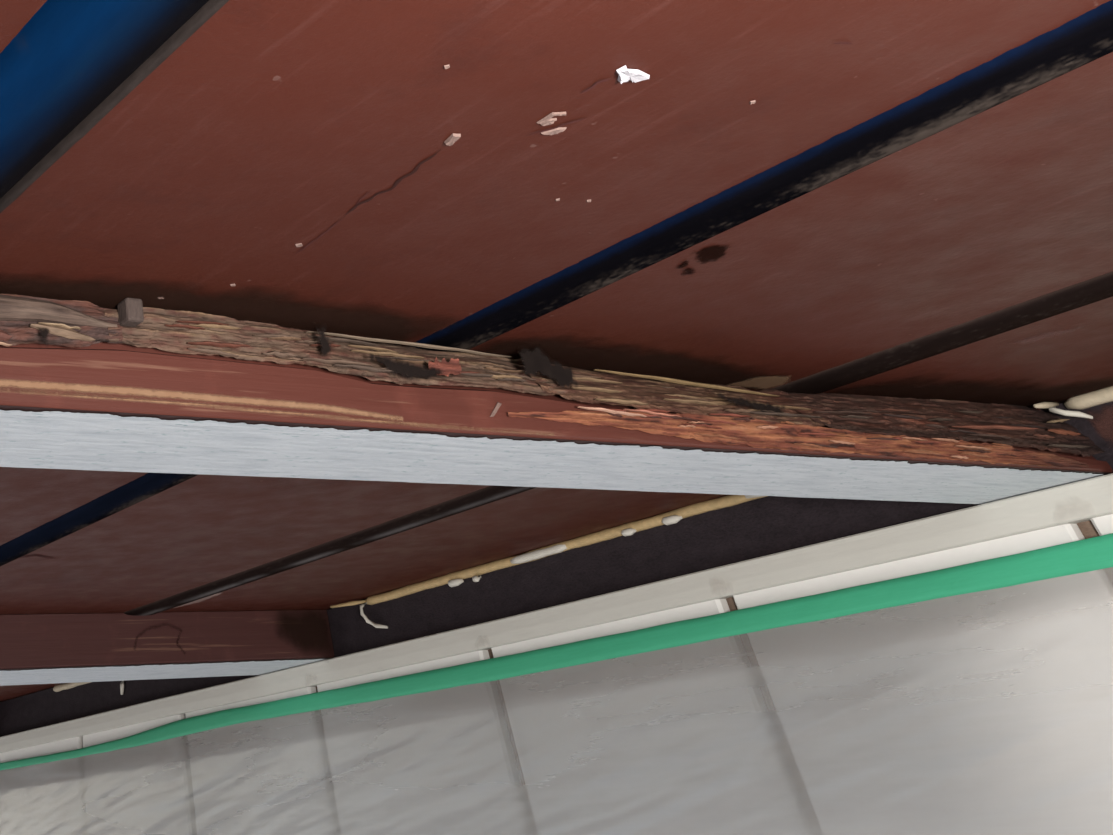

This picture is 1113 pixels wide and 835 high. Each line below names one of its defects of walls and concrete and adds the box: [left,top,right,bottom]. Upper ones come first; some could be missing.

peeling [616,65,650,84]
peeling [536,112,567,135]
crack [293,151,439,256]
leakage [677,246,728,275]
peeling [0,380,417,425]
peeling [508,406,1088,468]